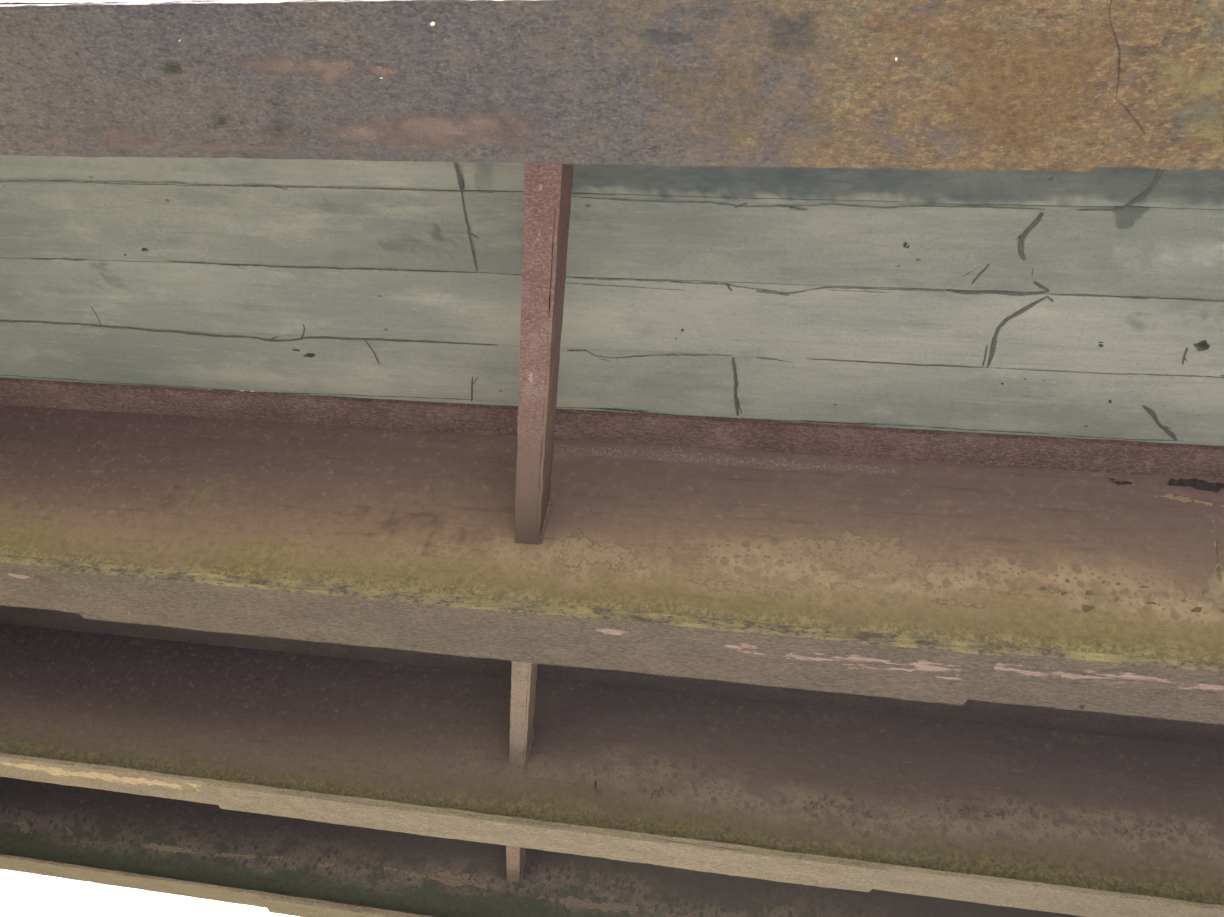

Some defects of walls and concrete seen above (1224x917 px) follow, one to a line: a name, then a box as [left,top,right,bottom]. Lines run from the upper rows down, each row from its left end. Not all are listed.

crack [1106,8,1145,134]
crack [1076,169,1163,211]
crack [6,162,494,273]
crack [558,196,1224,441]
peeling [589,626,629,635]
peeling [724,643,962,680]
peeling [993,662,1224,691]